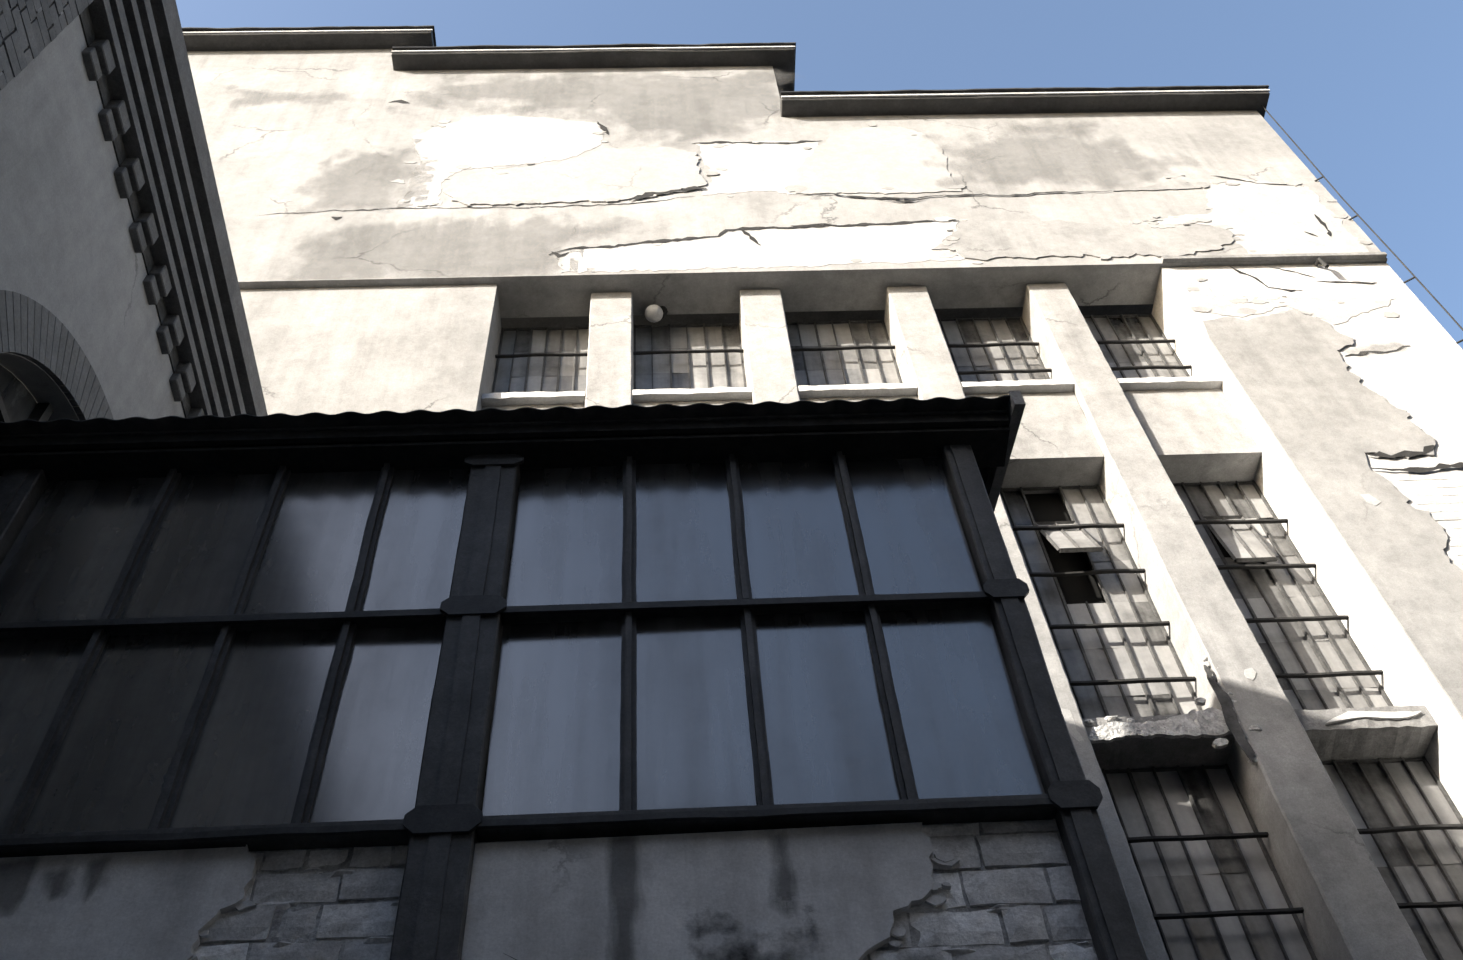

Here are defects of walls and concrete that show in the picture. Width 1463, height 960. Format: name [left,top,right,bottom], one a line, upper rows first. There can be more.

flaking render [389,115,608,209]
flaking render [697,141,819,197]
flaking render [556,216,982,273]
flaking render [1143,178,1372,255]
flaking render [1179,273,1399,325]
flaking render [1392,472,1463,566]
flaking render [190,846,408,960]
flaking render [862,820,1096,960]